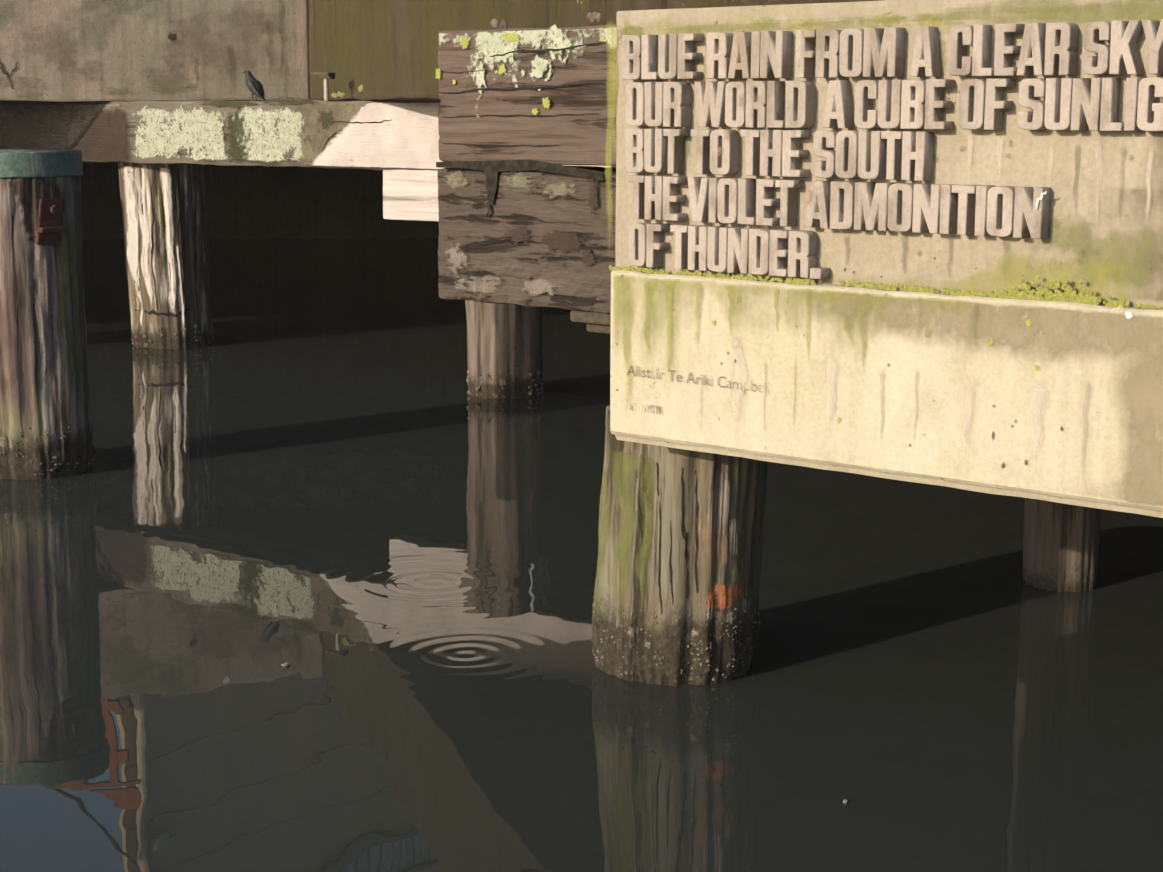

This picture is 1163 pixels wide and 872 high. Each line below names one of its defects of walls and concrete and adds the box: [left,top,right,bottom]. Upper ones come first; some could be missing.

crack [0,61,18,89]
water stain [818,294,1163,506]